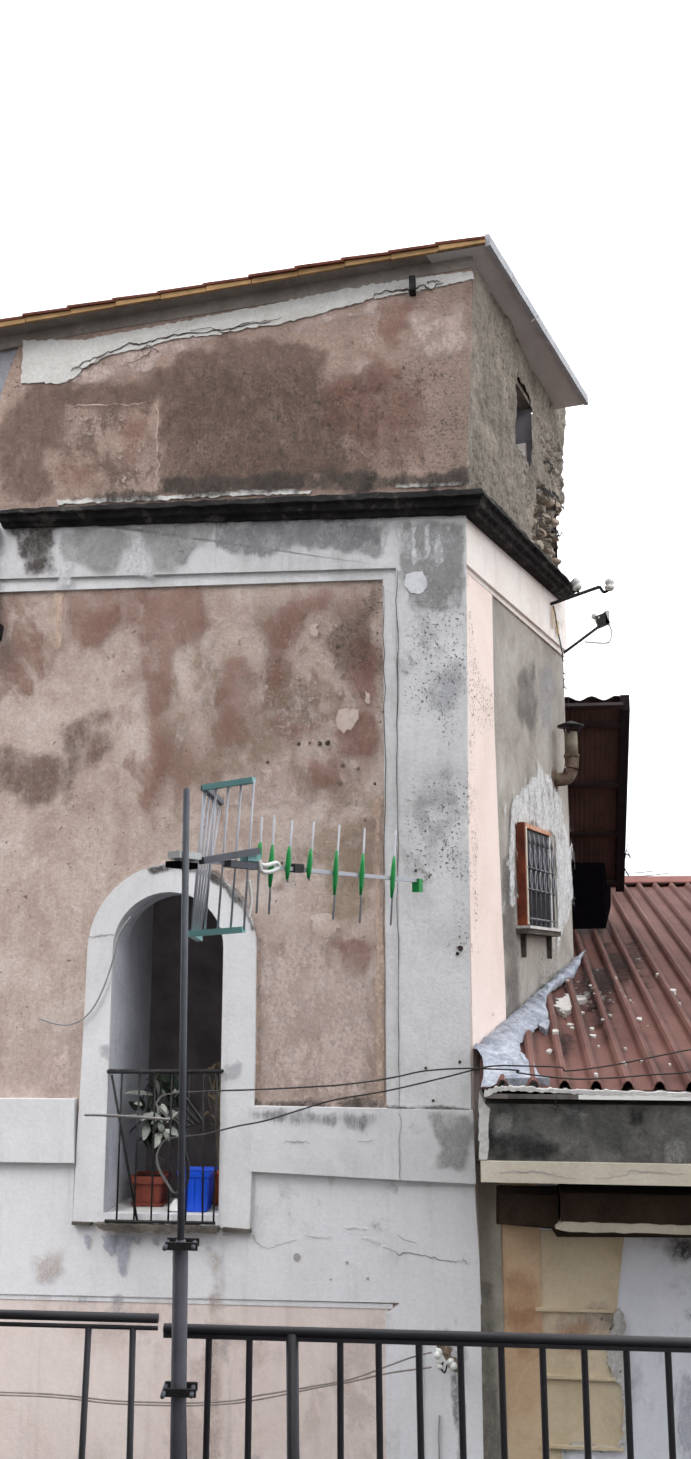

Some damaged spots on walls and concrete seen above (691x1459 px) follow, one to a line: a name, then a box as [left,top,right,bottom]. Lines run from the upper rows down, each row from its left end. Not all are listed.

crack [374,280,443,296]
water stain [0,301,469,503]
spalling [531,489,562,566]
water stain [254,1043,473,1169]
flaking render [561,1308,634,1459]